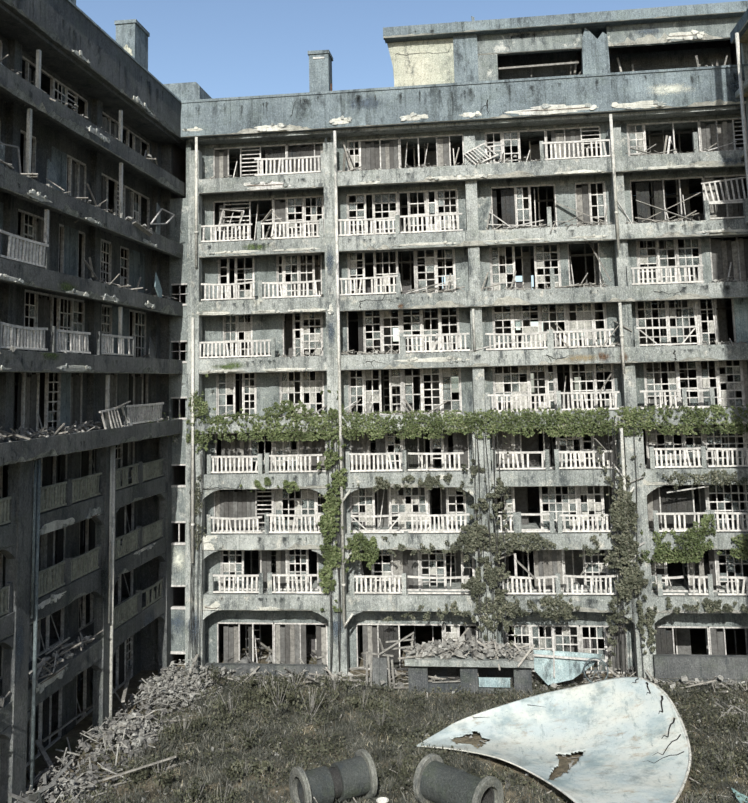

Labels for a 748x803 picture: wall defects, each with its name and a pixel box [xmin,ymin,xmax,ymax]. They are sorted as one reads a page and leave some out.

spalling [667,30,705,41]
water stain [352,95,377,106]
spalling [504,103,599,115]
spalling [254,123,287,131]